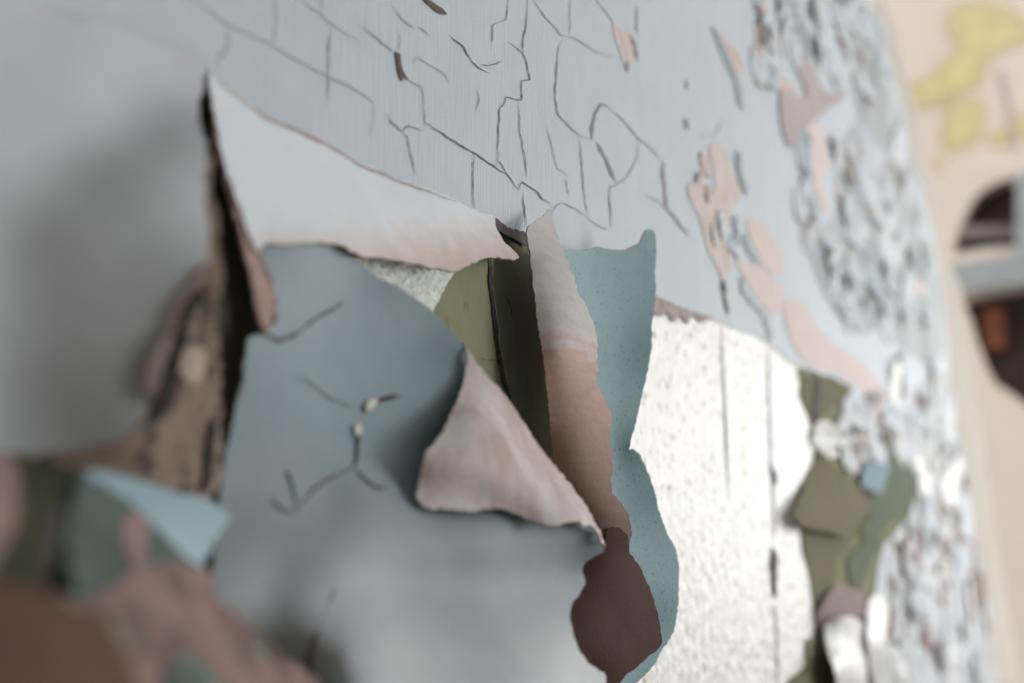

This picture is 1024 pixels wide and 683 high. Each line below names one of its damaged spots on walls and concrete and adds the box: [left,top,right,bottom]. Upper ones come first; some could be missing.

crack [197,0,689,236]
crack [262,302,344,342]
crack [270,378,400,513]
peeling [0,0,679,683]
peeling [686,0,996,683]